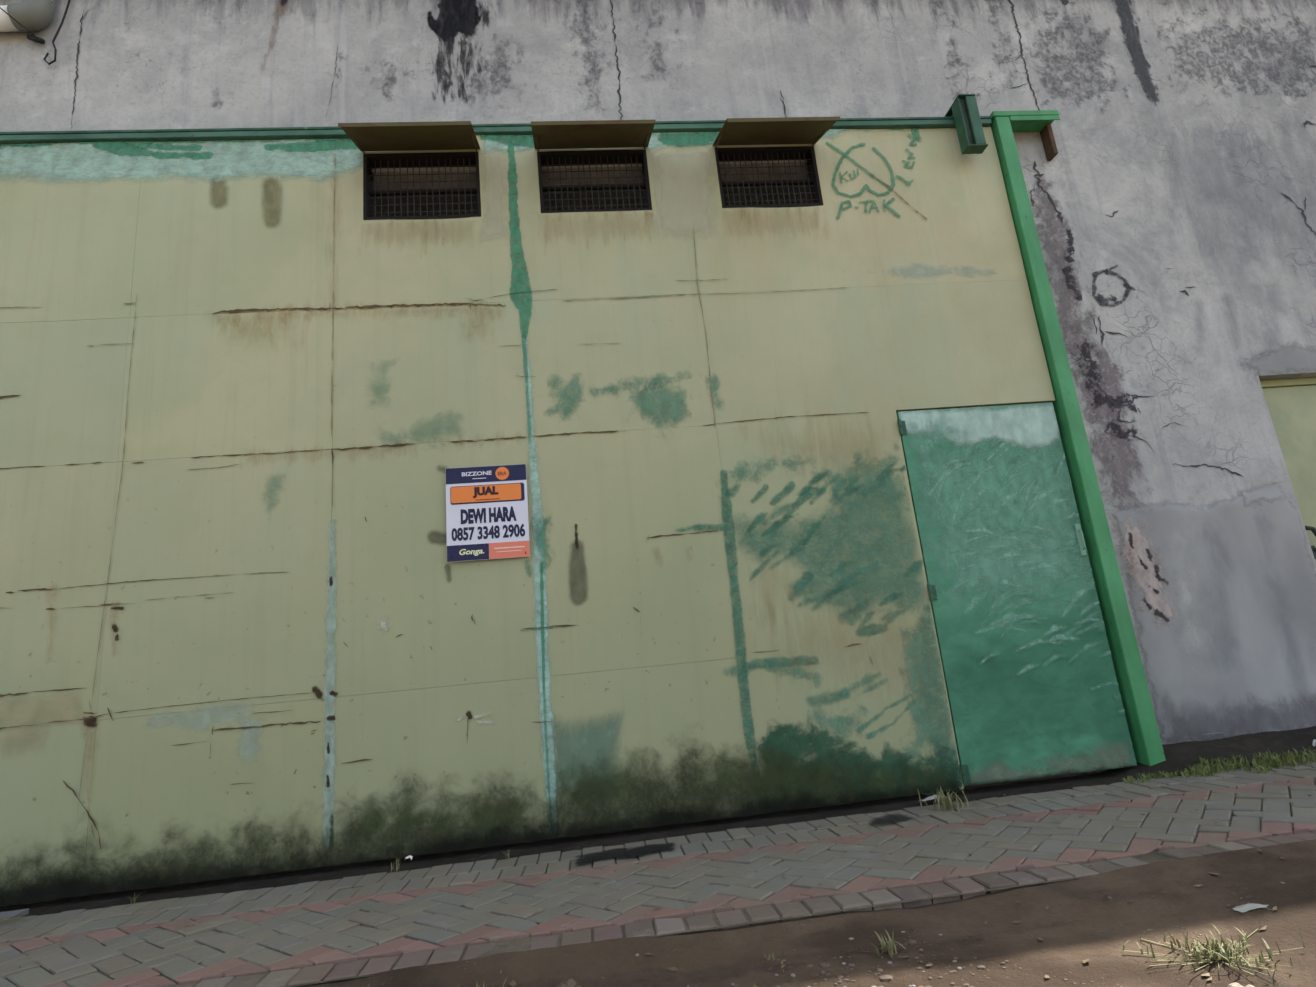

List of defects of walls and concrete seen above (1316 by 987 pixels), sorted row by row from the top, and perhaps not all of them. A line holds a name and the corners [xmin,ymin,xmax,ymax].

crack [70,10,88,130]
damp [427,0,489,101]
crack [610,0,624,119]
crack [1008,0,1042,110]
damp [1037,0,1159,105]
damp [1172,14,1316,96]
crack [1280,192,1316,235]
damp [1092,265,1136,307]
flaking render [1031,179,1173,622]
crack [1092,316,1242,476]
rust [0,297,323,848]
damp [871,813,911,825]